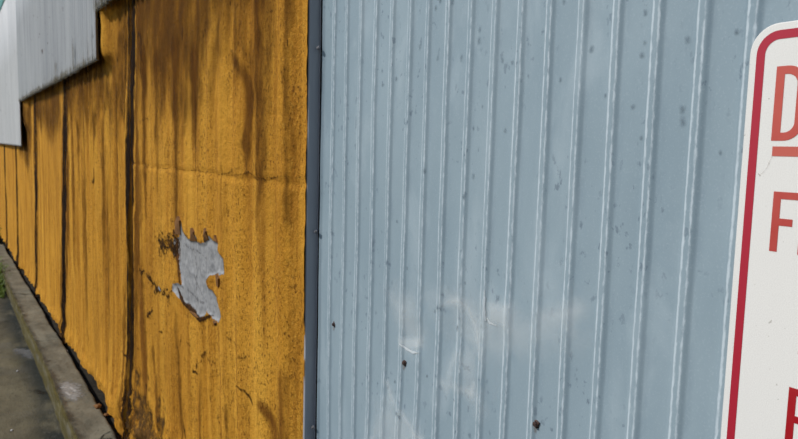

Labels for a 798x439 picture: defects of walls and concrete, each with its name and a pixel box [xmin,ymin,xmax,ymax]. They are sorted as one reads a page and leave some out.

damp [20,0,235,220]
damp [233,0,272,185]
peeling [172,216,224,326]